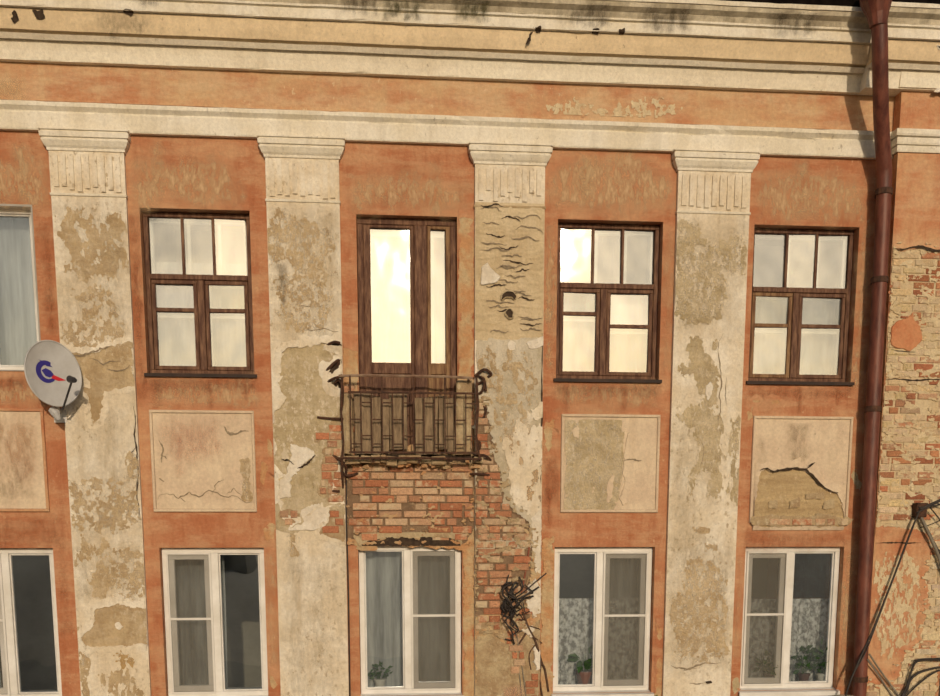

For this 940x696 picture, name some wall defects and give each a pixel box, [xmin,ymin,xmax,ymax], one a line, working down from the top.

peeling [546,96,683,118]
flaking render [55,206,135,429]
flaking render [68,451,148,696]
crack [131,406,249,514]
flaking render [239,207,633,696]
peeling [654,526,731,696]
peeling [675,219,760,506]
flaking render [750,457,863,530]
flaking render [866,237,940,696]